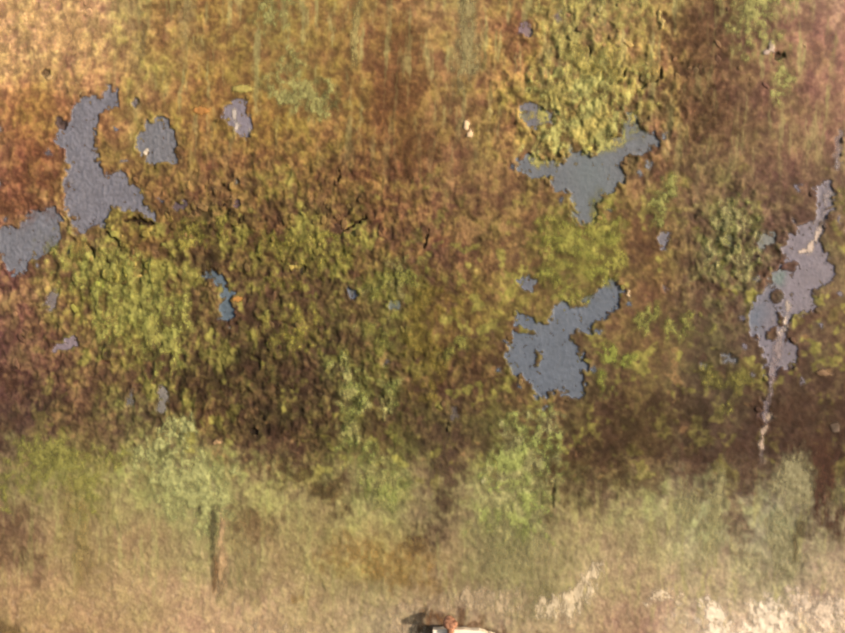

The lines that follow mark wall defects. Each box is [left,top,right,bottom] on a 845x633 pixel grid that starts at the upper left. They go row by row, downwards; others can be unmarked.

peeling [215,85,254,137]
peeling [0,84,247,300]
peeling [511,112,668,226]
peeling [191,264,250,328]
peeling [516,275,537,293]
peeling [739,180,840,385]
damp [799,226,822,253]
peeling [497,279,632,410]
mould [279,463,350,515]
damp [433,424,465,514]
damp [695,300,845,633]
efflorescence [644,588,684,607]